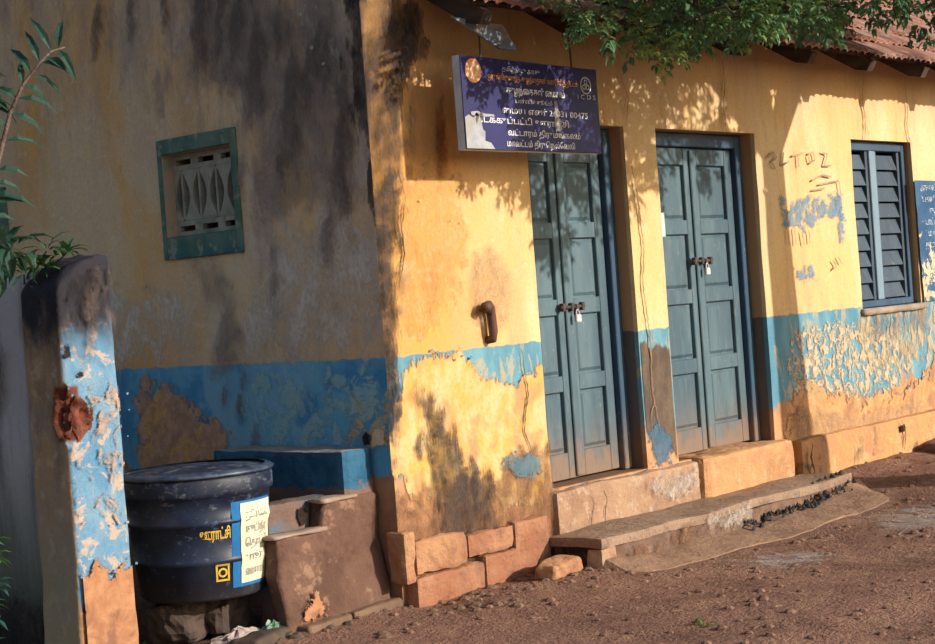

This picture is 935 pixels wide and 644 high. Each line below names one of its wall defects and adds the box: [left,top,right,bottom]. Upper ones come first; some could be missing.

water stain [190,0,430,426]
peeling [94,493,129,525]
peeling [52,374,236,481]
peeling [109,282,192,369]
peeling [344,349,553,511]
water stain [396,389,559,556]
crack [521,350,533,455]
crack [631,161,660,427]
peeling [784,302,935,451]